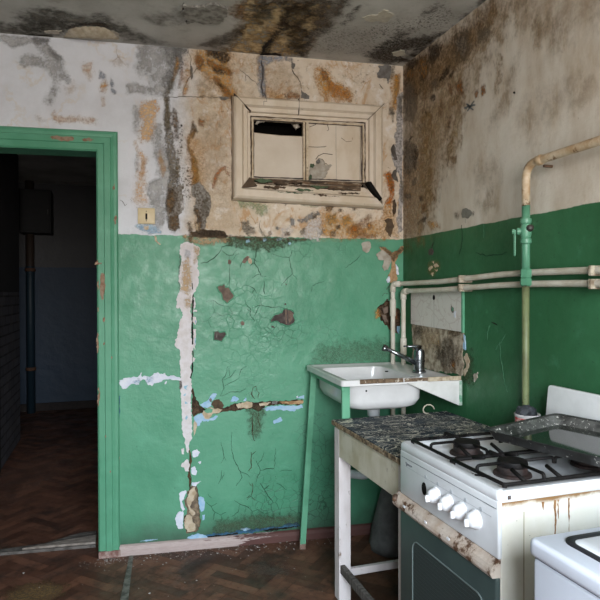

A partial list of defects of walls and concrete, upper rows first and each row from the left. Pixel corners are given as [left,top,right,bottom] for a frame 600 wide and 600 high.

crack [239,39,309,115]
leakage [305,0,359,46]
leakage [364,7,452,71]
leakage [0,9,211,232]
peeling [254,158,360,197]
peeling [389,92,404,233]
leakage [404,137,418,185]
peeling [361,241,404,333]
crack [178,282,232,378]
peeling [119,222,307,539]
crack [185,448,193,490]
crack [206,435,291,519]